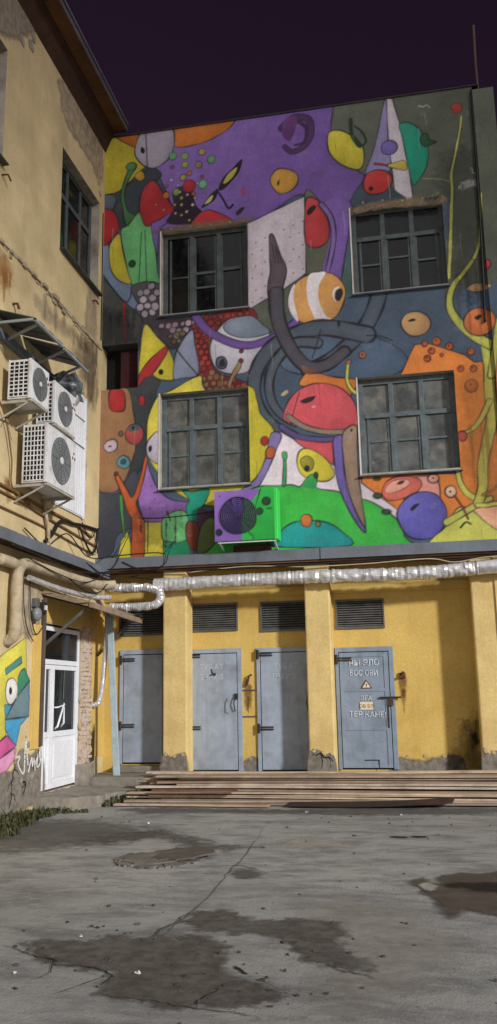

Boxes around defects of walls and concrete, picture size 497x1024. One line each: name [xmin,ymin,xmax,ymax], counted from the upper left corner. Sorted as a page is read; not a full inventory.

flaking render [0,0,36,53]
spalling [160,753,189,771]
spalling [308,749,337,771]
water stain [411,872,497,918]
water stain [21,909,372,1009]